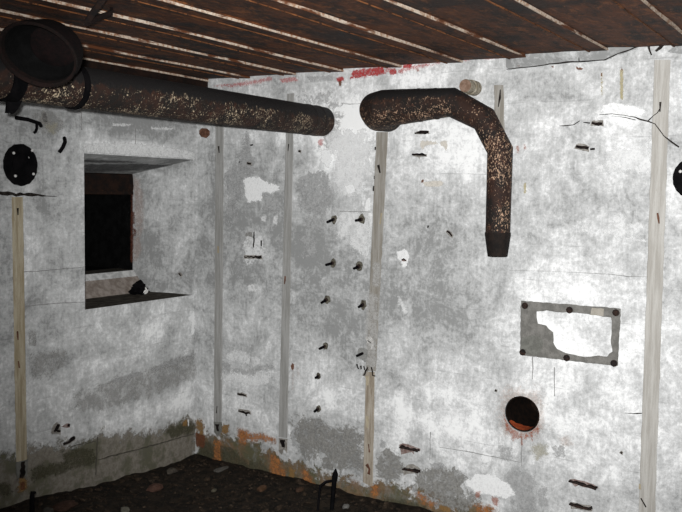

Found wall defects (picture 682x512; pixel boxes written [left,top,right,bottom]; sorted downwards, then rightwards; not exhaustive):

crack [599,109,679,148]
peeling [243,176,279,203]
rust [237,429,276,444]
damp [0,414,492,512]
rust [270,454,315,484]
peeling [374,440,548,512]